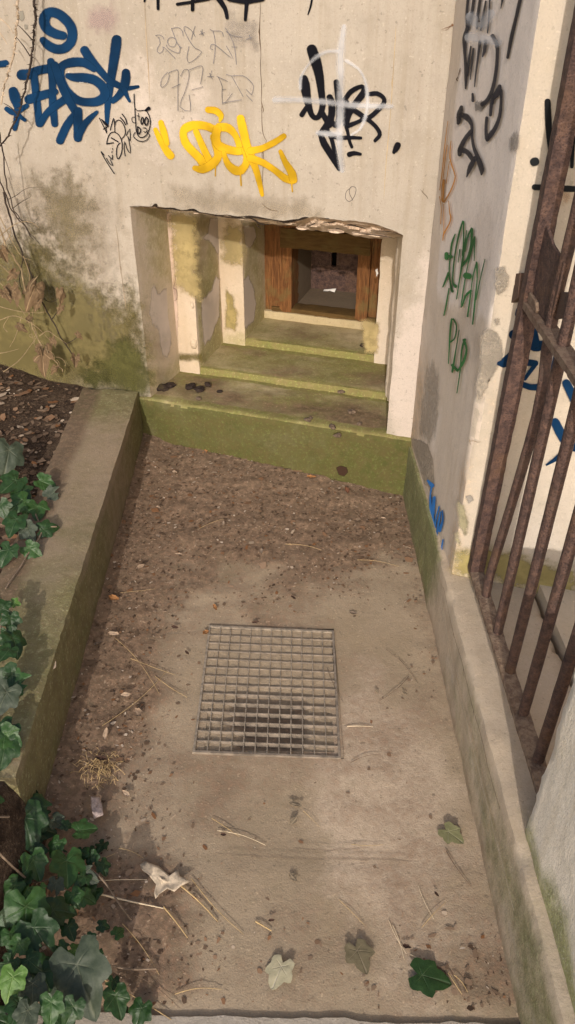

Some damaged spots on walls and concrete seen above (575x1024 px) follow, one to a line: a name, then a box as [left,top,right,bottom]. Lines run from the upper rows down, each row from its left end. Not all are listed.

leakage [14,180,95,275]
spalling [144,206,403,357]
spalling [476,319,503,398]